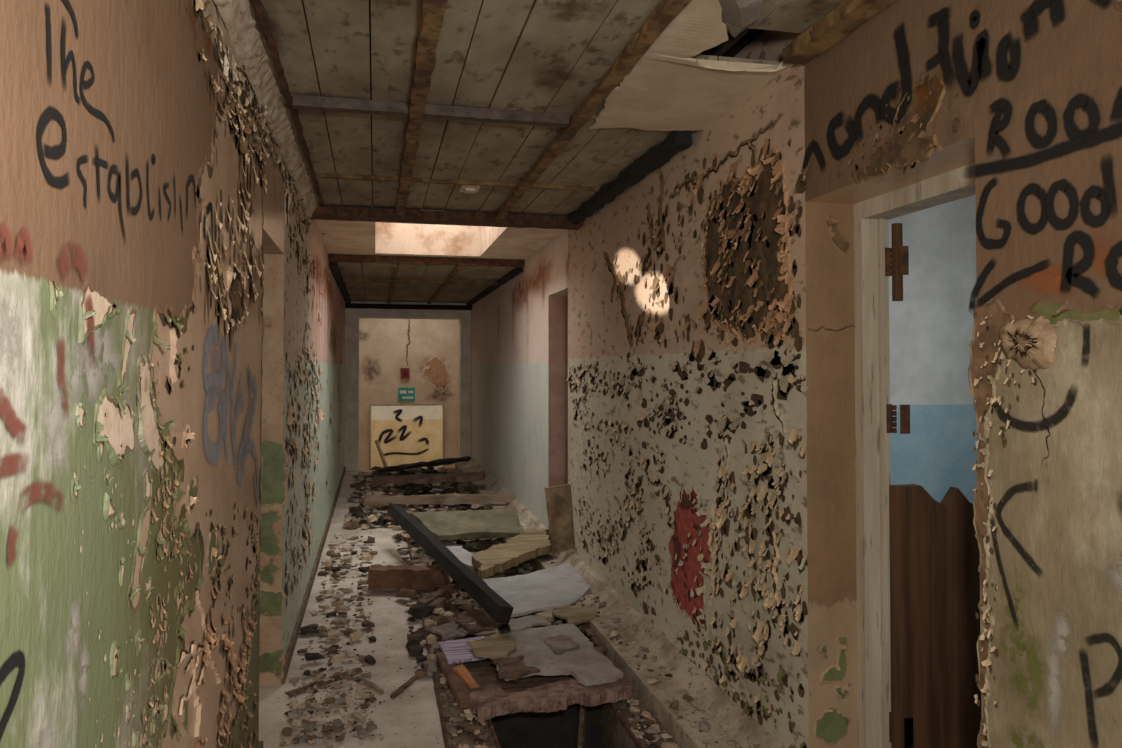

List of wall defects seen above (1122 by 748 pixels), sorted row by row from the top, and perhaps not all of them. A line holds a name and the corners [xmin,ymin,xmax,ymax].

peeling [70,0,343,748]
peeling [567,138,810,748]